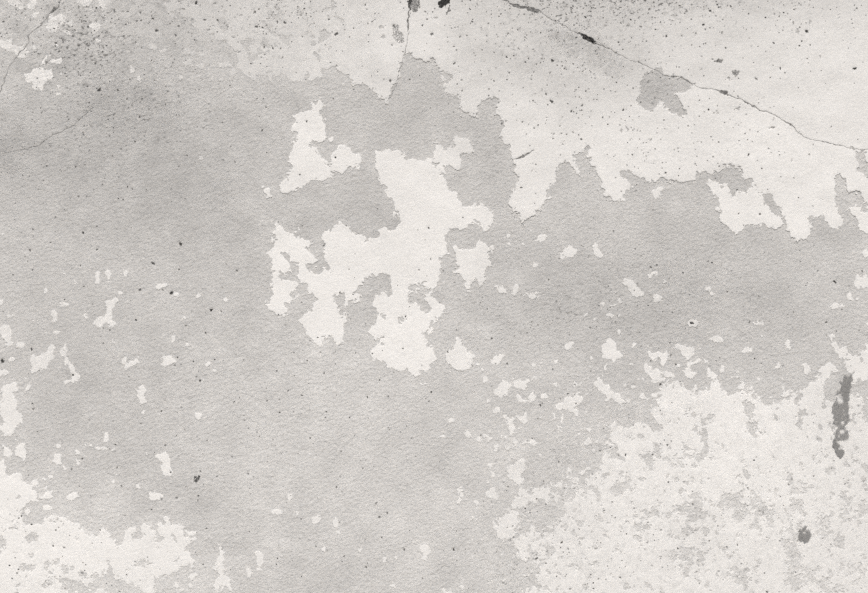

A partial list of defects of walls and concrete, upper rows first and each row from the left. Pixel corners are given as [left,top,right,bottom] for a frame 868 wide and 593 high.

crack [0,0,61,92]
peeling [0,0,102,96]
crack [387,1,411,101]
crack [505,0,867,151]
crack [1,107,93,154]
peeling [130,0,868,254]
peeling [83,291,123,329]
peeling [264,135,868,593]
peeling [0,302,207,593]
peeling [212,544,232,593]